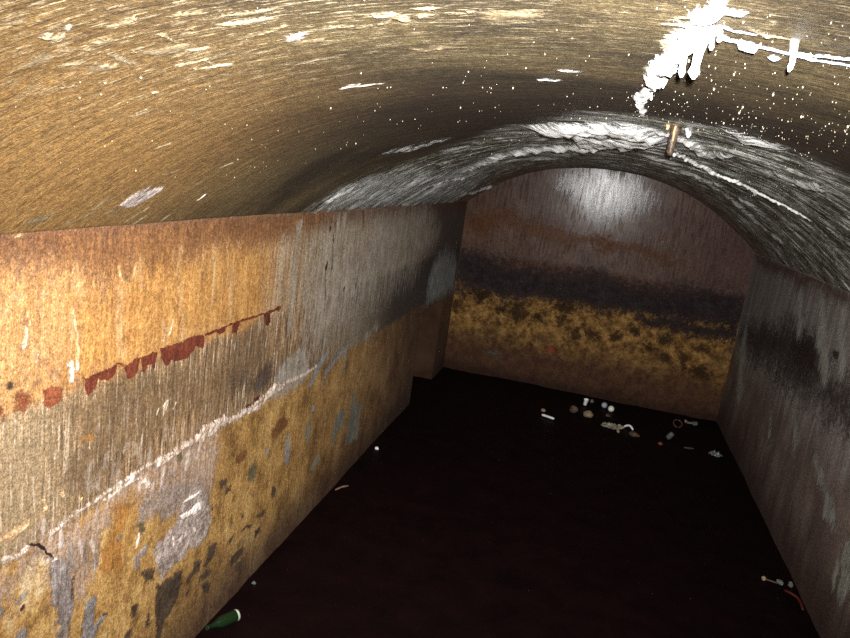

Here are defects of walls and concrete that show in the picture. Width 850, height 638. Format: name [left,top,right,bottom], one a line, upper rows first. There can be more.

damp [4,0,850,451]
corrosion [15,390,30,414]
corrosion [43,246,281,408]
crack [21,543,58,562]
damp [0,428,231,638]
damp [813,453,836,531]